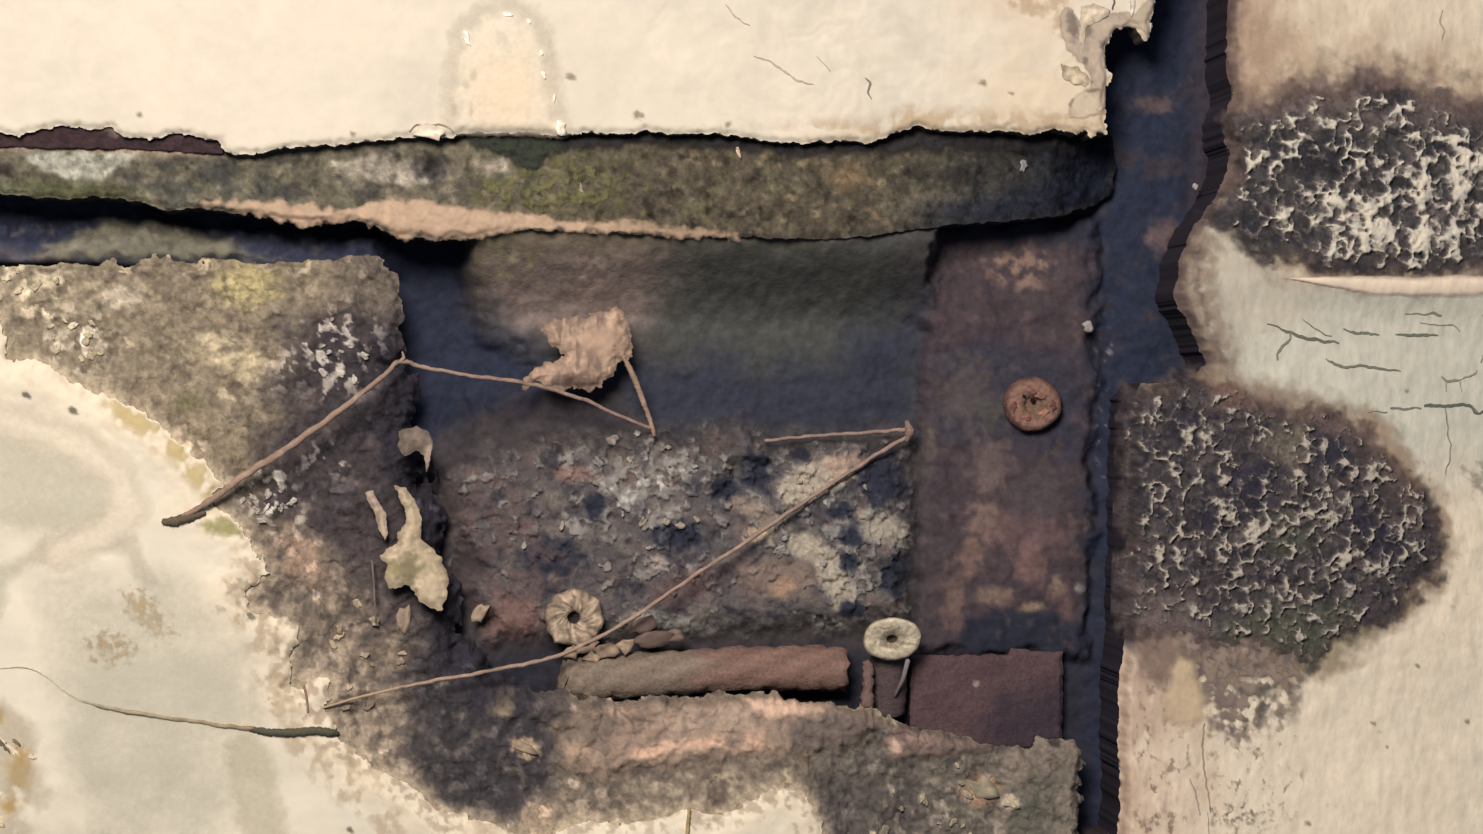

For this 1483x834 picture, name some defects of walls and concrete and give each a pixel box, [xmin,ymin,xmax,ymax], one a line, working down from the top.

peeling [412,123,445,141]
peeling [555,120,566,136]
peeling [200,198,739,241]
leakage [1110,51,1483,758]
crack [1267,311,1483,475]
spalling [0,253,1086,834]